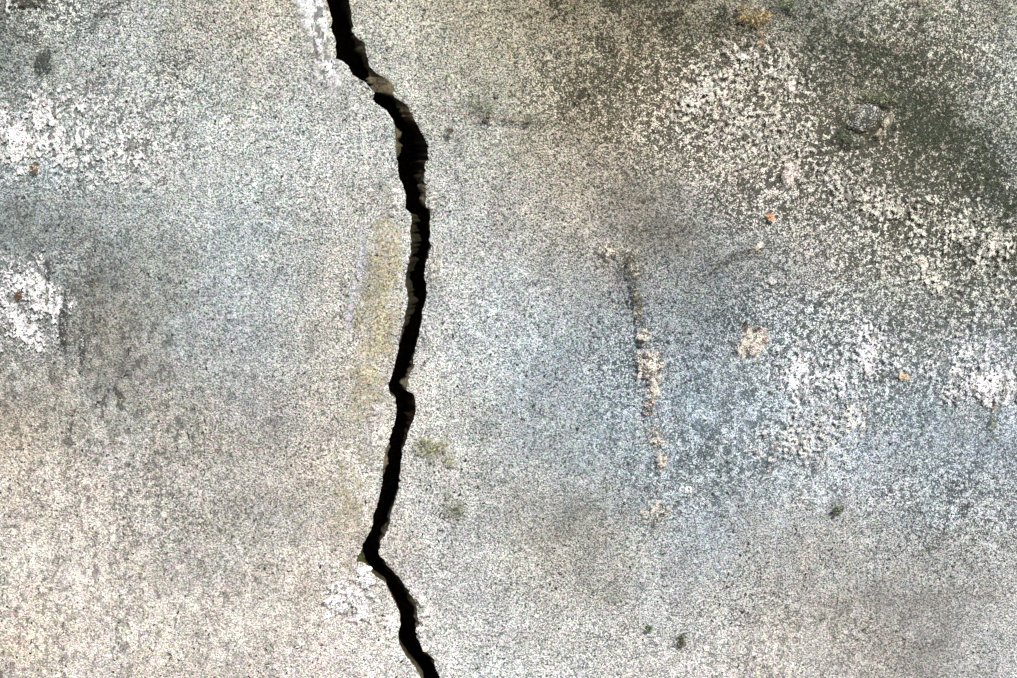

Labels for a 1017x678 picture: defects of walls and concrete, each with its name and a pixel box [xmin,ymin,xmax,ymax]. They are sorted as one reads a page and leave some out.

crack [326,0,606,678]
water stain [500,0,1017,286]